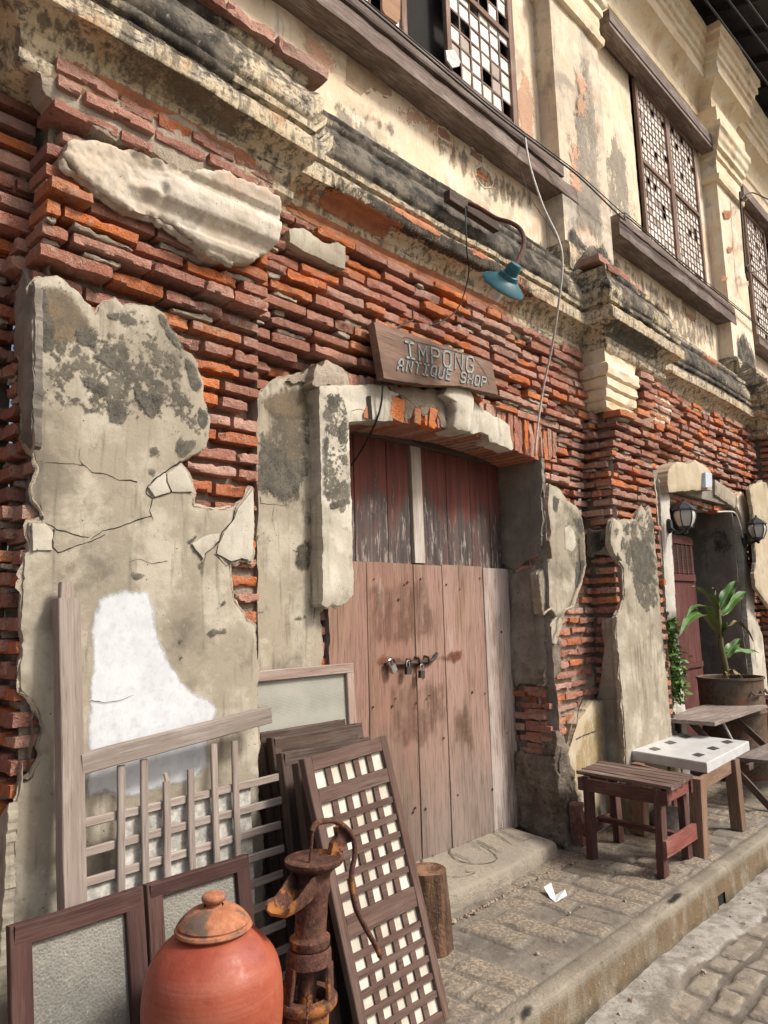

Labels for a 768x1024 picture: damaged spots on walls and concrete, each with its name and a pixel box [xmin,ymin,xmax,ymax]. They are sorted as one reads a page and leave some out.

peeling [60,57,258,171]
water stain [99,27,260,142]
water stain [93,0,270,100]
peeling [284,186,511,315]
water stain [322,103,575,299]
water stain [570,54,750,414]
water stain [41,287,209,456]
flaking render [22,444,53,551]
crack [36,453,192,553]
flaking render [148,311,259,623]
crack [204,507,236,566]
flaking render [0,691,45,799]